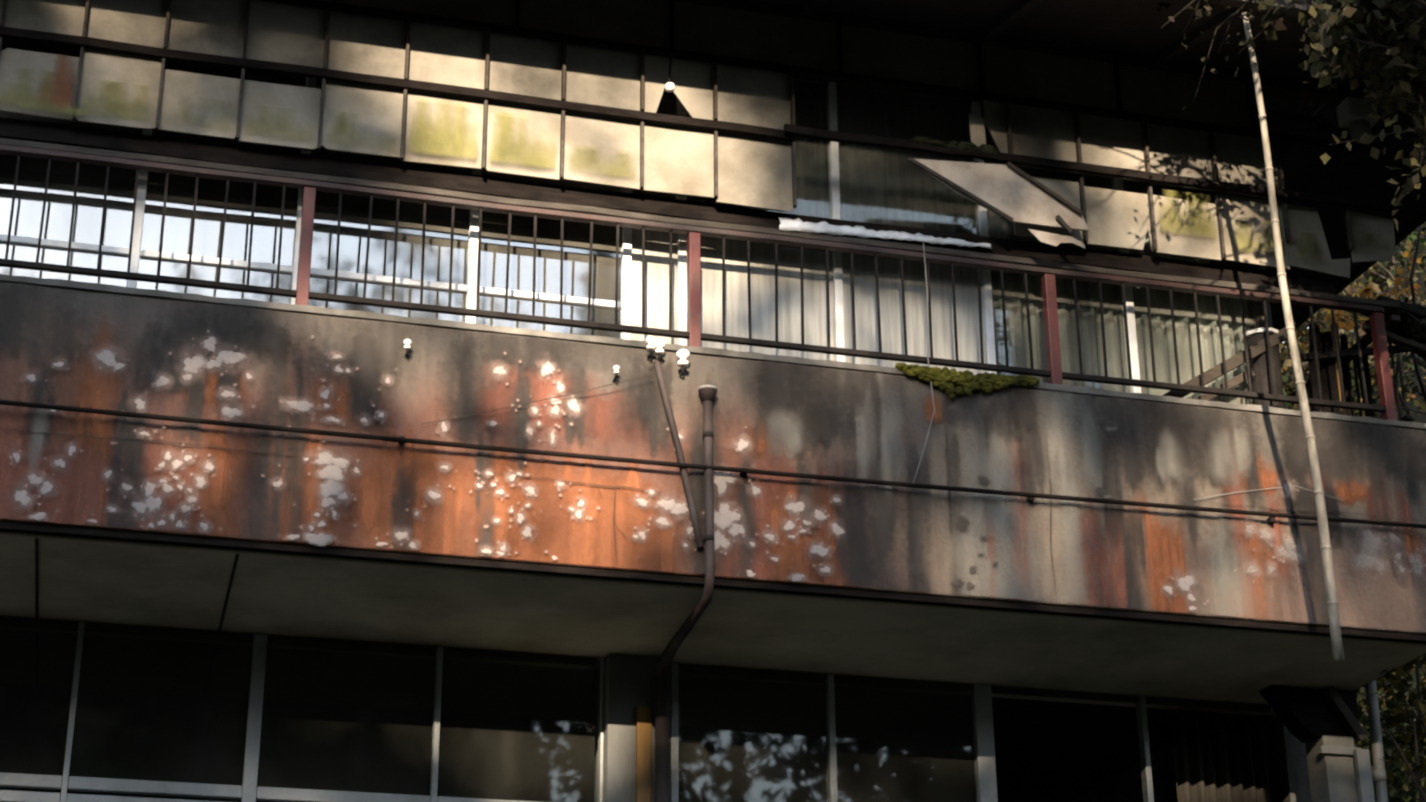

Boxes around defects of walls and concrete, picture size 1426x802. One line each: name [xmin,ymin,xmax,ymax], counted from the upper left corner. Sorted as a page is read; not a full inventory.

corrosion [0,336,111,526]
peeling [87,444,231,531]
peeling [123,330,255,421]
peeling [279,440,360,546]
peeling [405,362,581,557]
corrosion [358,432,675,572]
leakage [740,463,753,577]
leakage [755,360,928,592]
leakage [946,382,1076,599]
corrosion [1143,507,1191,613]
leakage [1083,397,1261,609]
corrosion [1200,444,1426,632]